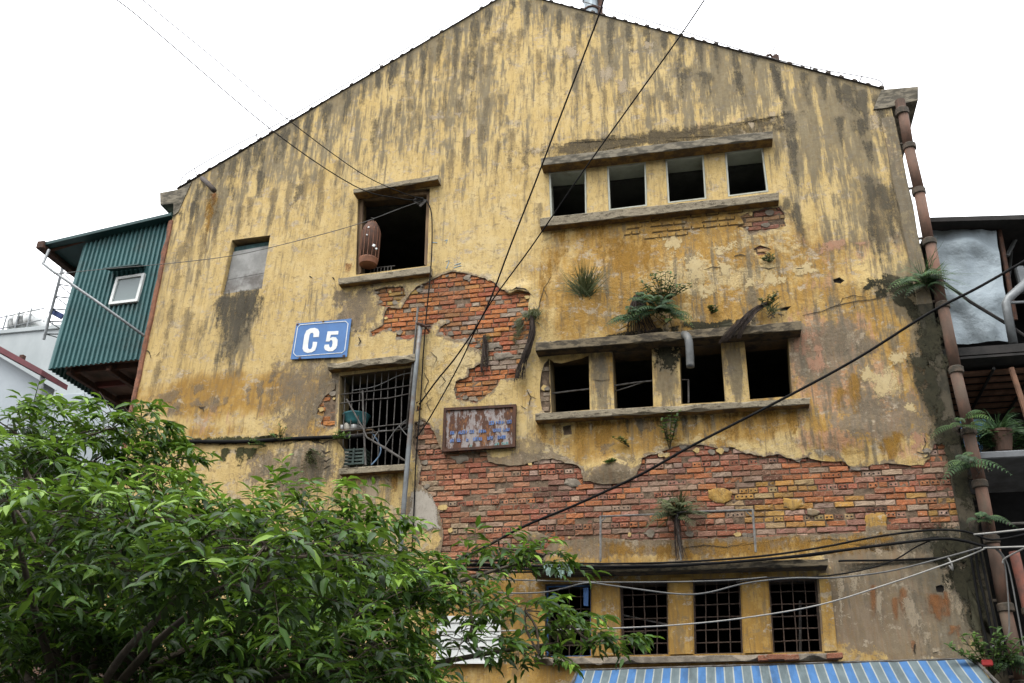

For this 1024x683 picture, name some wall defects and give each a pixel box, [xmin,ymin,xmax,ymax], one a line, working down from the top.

damp [510,0,562,37]
damp [575,13,718,94]
damp [217,8,493,196]
damp [542,63,798,173]
damp [801,72,887,161]
flaking render [624,207,866,299]
damp [783,198,804,246]
damp [215,288,259,365]
flaking render [371,271,531,403]
flaking render [316,379,338,428]
damp [863,273,976,510]
flaking render [413,352,960,575]